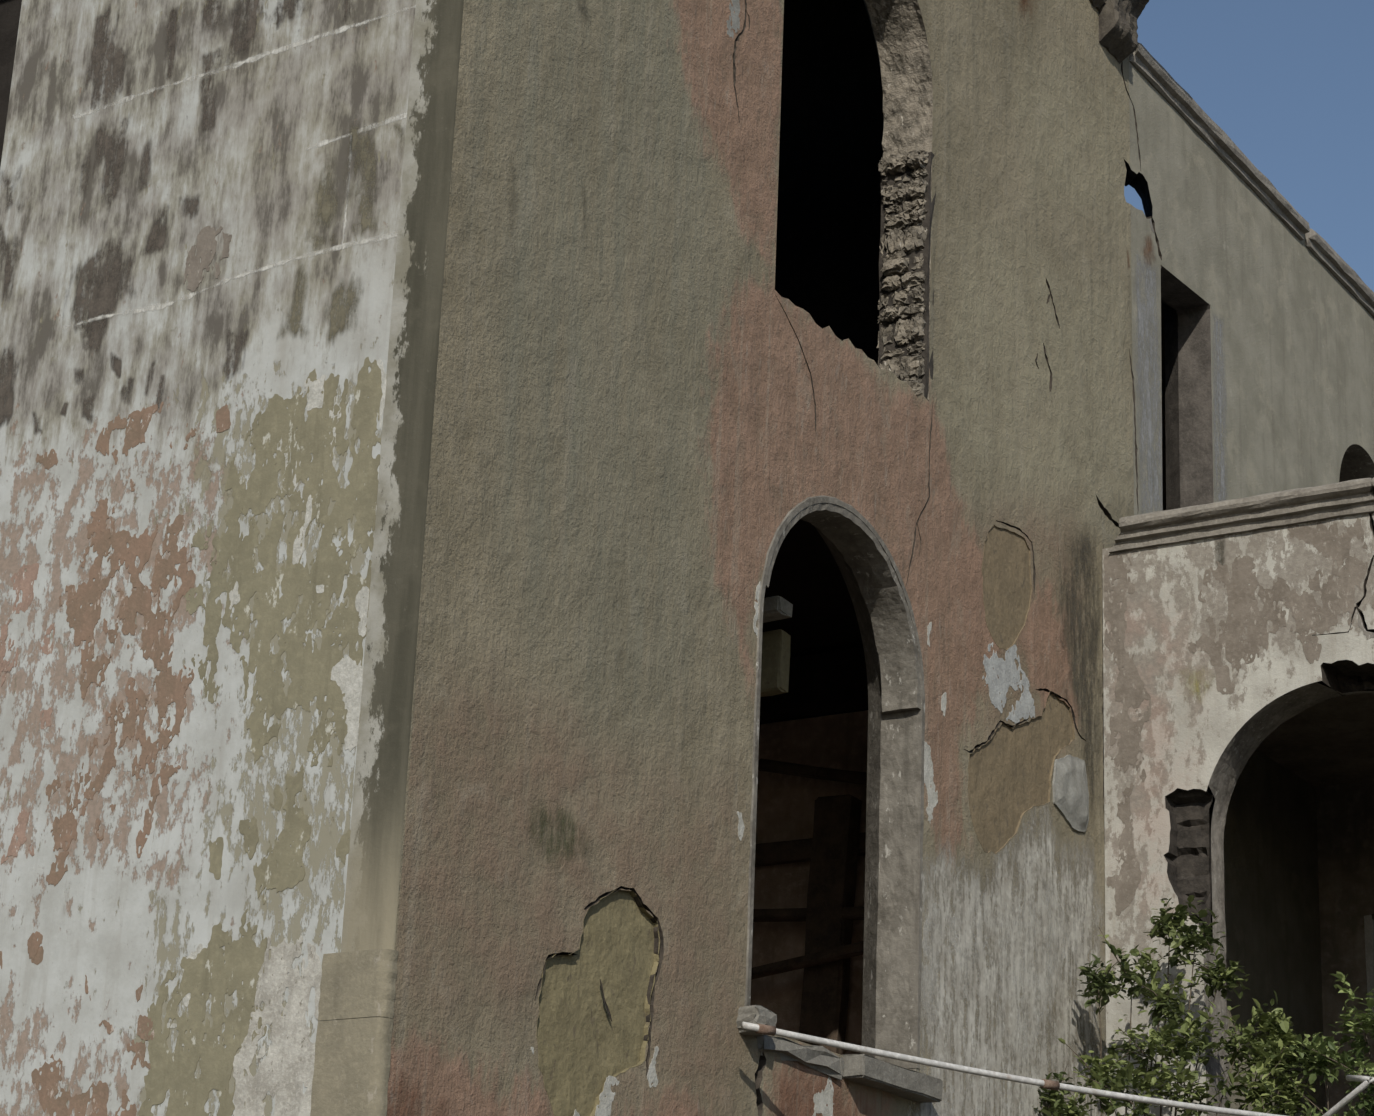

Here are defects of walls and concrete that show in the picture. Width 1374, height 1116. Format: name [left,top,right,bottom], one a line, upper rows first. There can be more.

leakage [86,8,130,106]
leakage [201,0,298,130]
crack [732,0,750,117]
leakage [0,349,18,426]
leakage [73,241,164,408]
crack [776,296,816,431]
flaking render [877,149,936,398]
peeling [1188,518,1374,696]
crack [1312,513,1374,640]
peeling [31,357,386,1116]
flaking render [1164,788,1213,937]
crack [755,1052,766,1116]